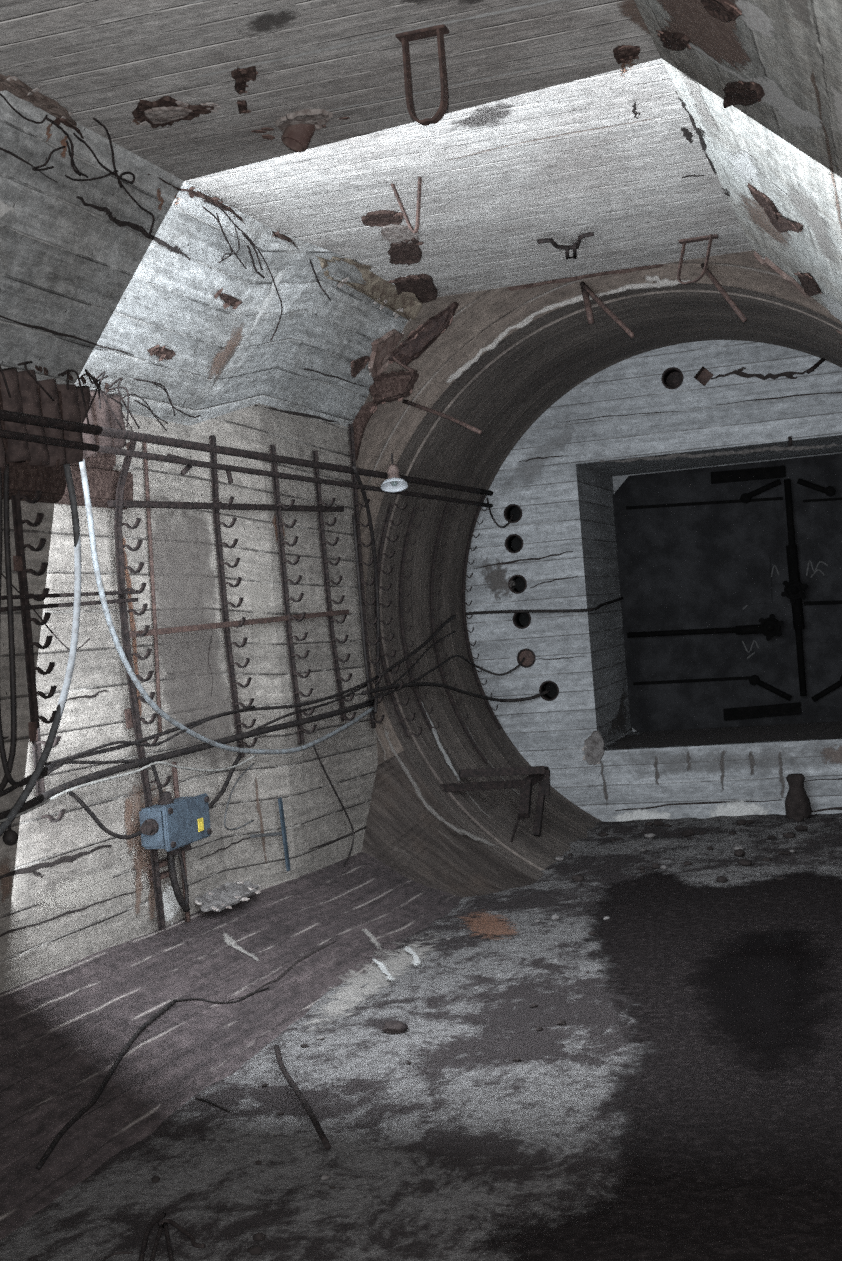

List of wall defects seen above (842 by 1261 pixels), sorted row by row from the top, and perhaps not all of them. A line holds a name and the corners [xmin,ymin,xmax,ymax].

spalling [613,45,641,76]
peeling [656,0,765,108]
spalling [0,74,84,157]
spalling [132,96,221,128]
spalling [231,66,258,114]
crack [0,147,191,260]
spalling [748,183,803,233]
spalling [317,210,483,461]
crack [711,367,842,405]